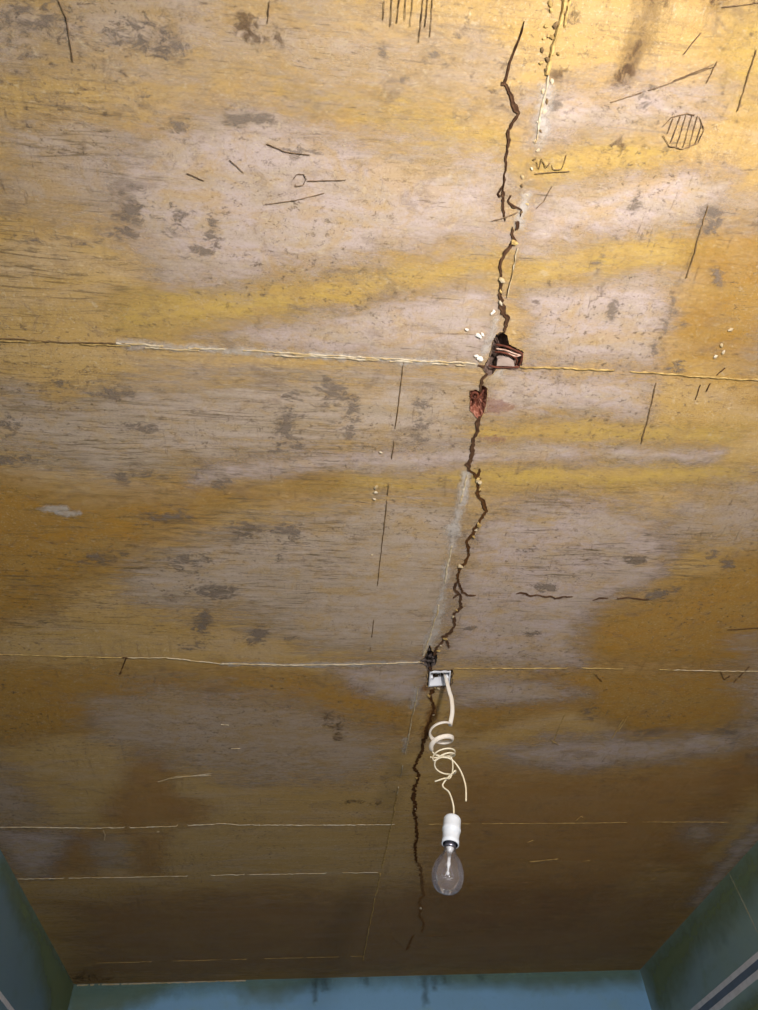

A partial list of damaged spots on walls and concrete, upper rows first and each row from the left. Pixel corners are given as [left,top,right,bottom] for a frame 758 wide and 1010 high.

crack [497,21,525,333]
crack [477,365,488,392]
crack [405,416,488,951]
crack [516,592,649,601]
damp [68,774,712,1010]